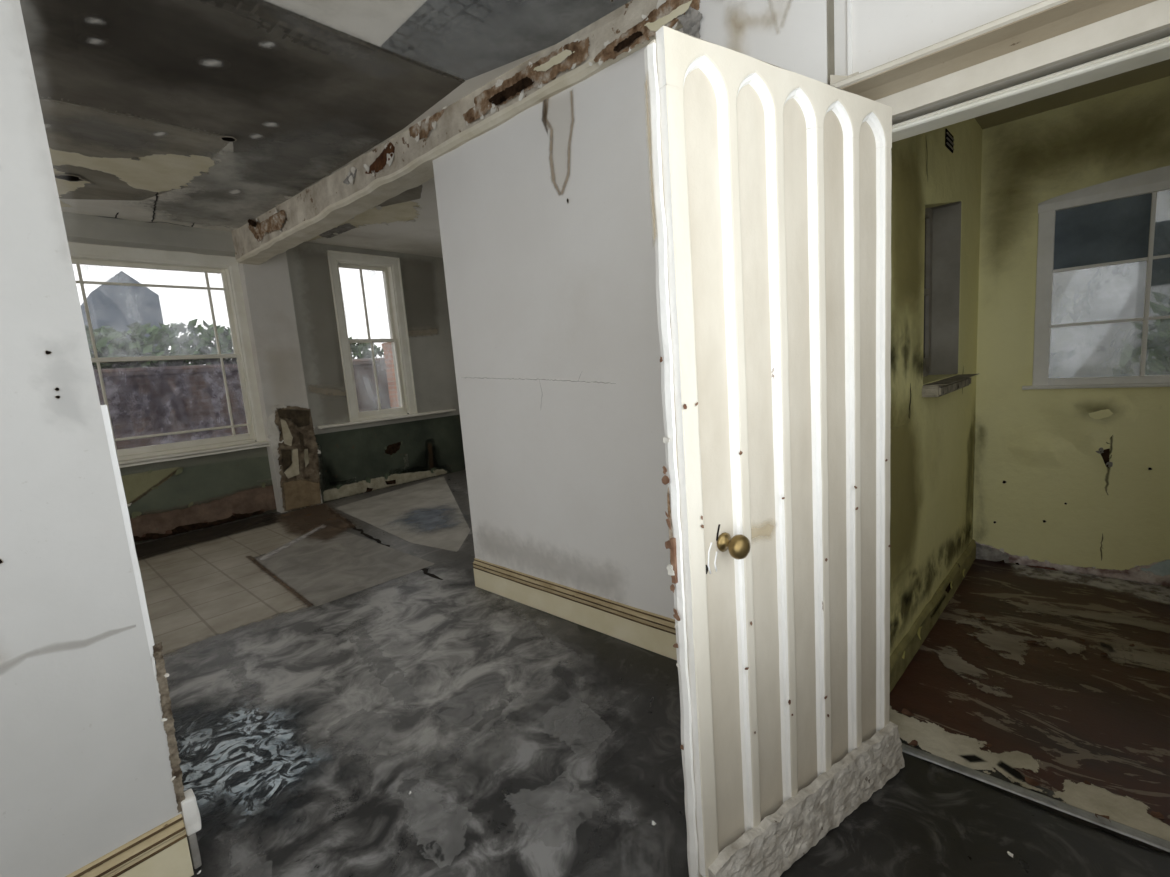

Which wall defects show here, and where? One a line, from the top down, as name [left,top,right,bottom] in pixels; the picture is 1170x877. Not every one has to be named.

flaking render [463,0,703,126]
flaking render [409,104,448,142]
peeling [49,148,215,207]
spalling [248,208,286,244]
peeling [305,185,422,243]
flaking render [343,142,395,185]
spalling [121,404,447,542]
damp [890,408,917,577]
crack [1105,435,1113,495]
damp [890,563,935,642]
spalling [890,541,1170,698]
peeling [889,706,1170,841]